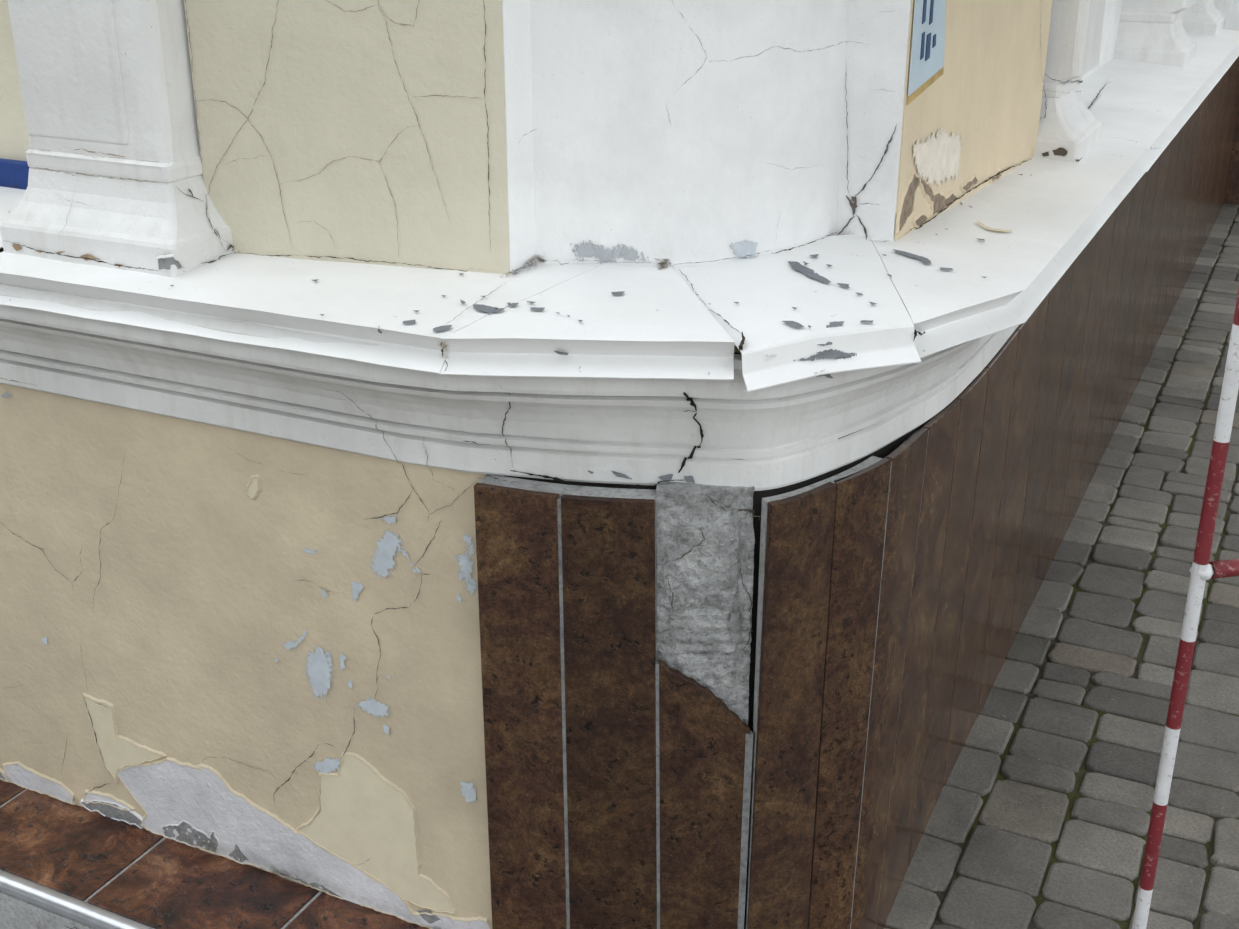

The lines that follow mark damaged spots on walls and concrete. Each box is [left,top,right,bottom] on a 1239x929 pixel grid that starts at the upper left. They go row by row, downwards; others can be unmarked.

crack [8,0,536,272]
crack [666,1,897,242]
peeling [882,127,1002,270]
peeling [460,296,583,322]
peeling [570,240,649,263]
peeling [782,307,857,378]
peeling [788,254,877,305]
peeling [371,516,420,578]
peeling [455,534,477,602]
crack [198,381,761,804]
peeling [273,630,391,735]
peeling [0,693,492,929]